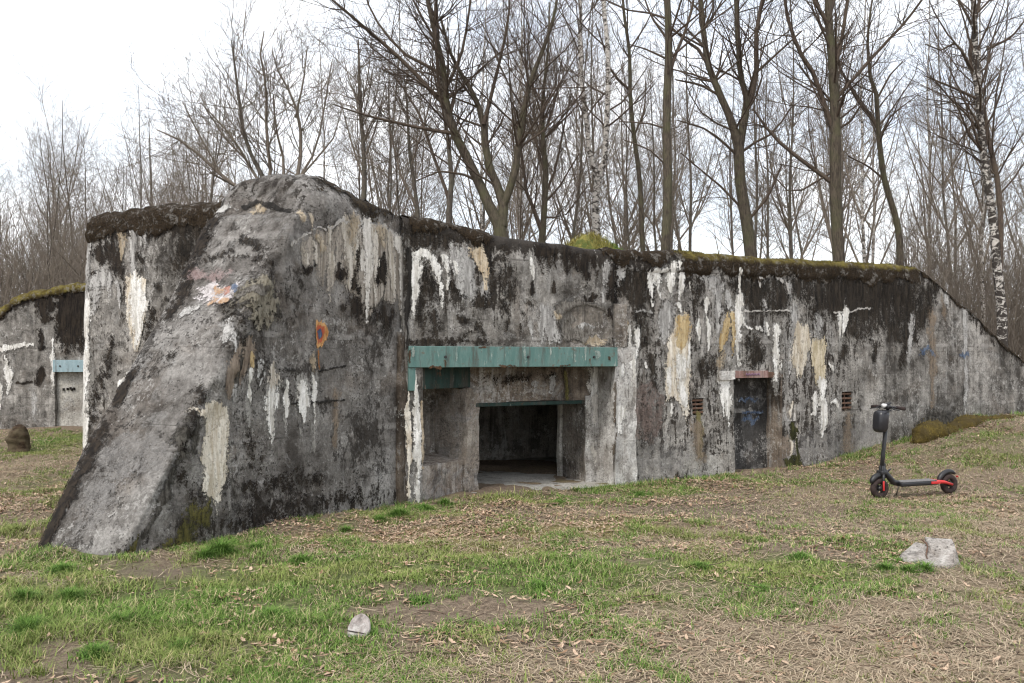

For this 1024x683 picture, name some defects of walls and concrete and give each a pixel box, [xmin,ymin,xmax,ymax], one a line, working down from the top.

water stain [294,210,490,357]
water stain [616,399,626,434]
water stain [618,260,849,443]
water stain [906,313,915,371]